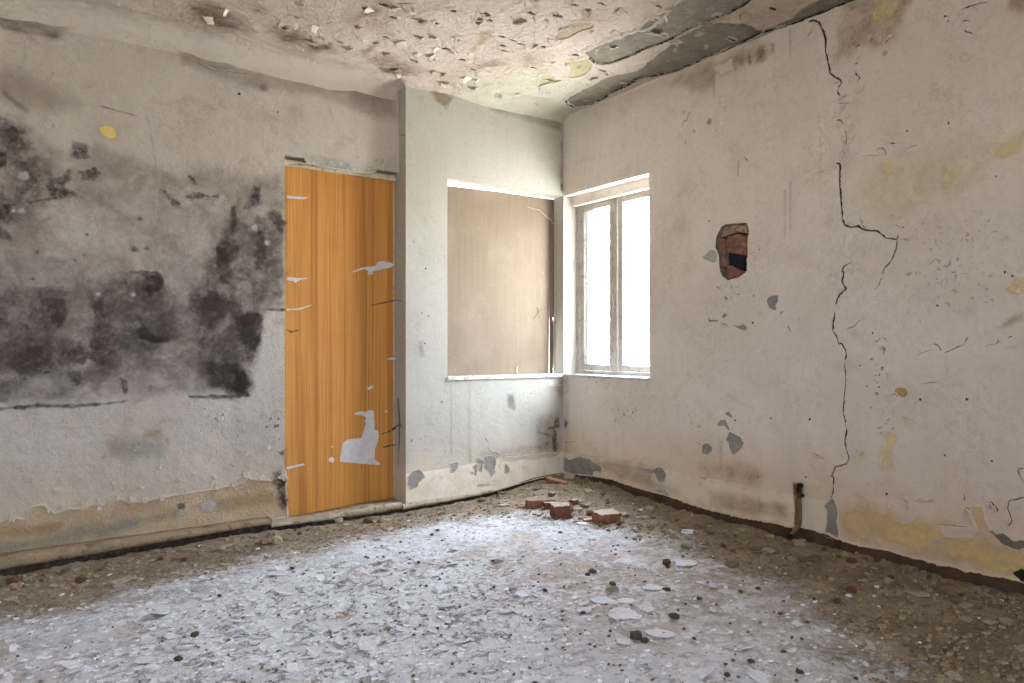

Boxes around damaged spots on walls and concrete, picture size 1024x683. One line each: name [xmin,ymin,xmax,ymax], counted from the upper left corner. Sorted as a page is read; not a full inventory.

peeling [346,28,480,87]
spalling [533,0,850,107]
leakage [0,126,68,238]
leakage [0,271,175,385]
leakage [190,208,285,398]
crack [538,0,918,498]
spalling [701,220,760,282]
peeling [0,470,289,553]
peeling [407,468,425,490]
peeling [471,455,510,488]
peeling [716,410,745,456]
flaking render [563,456,1024,595]